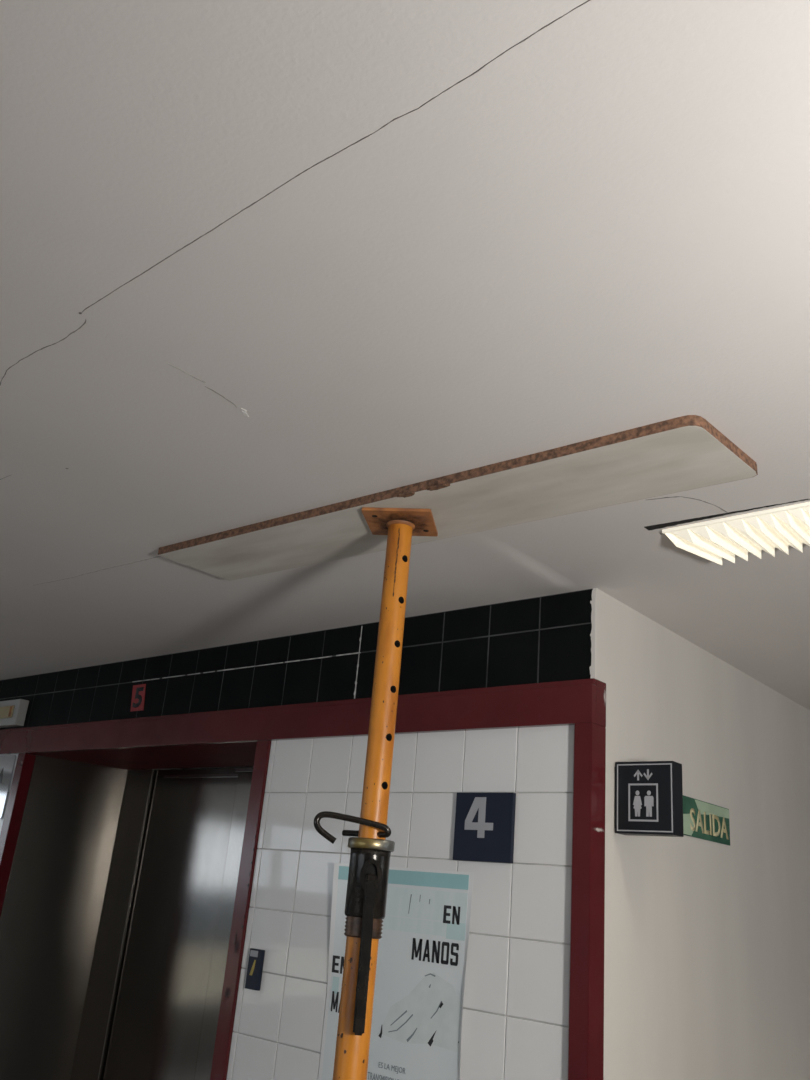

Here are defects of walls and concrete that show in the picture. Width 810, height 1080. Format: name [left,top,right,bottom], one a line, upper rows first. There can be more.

crack [0,0,590,385]